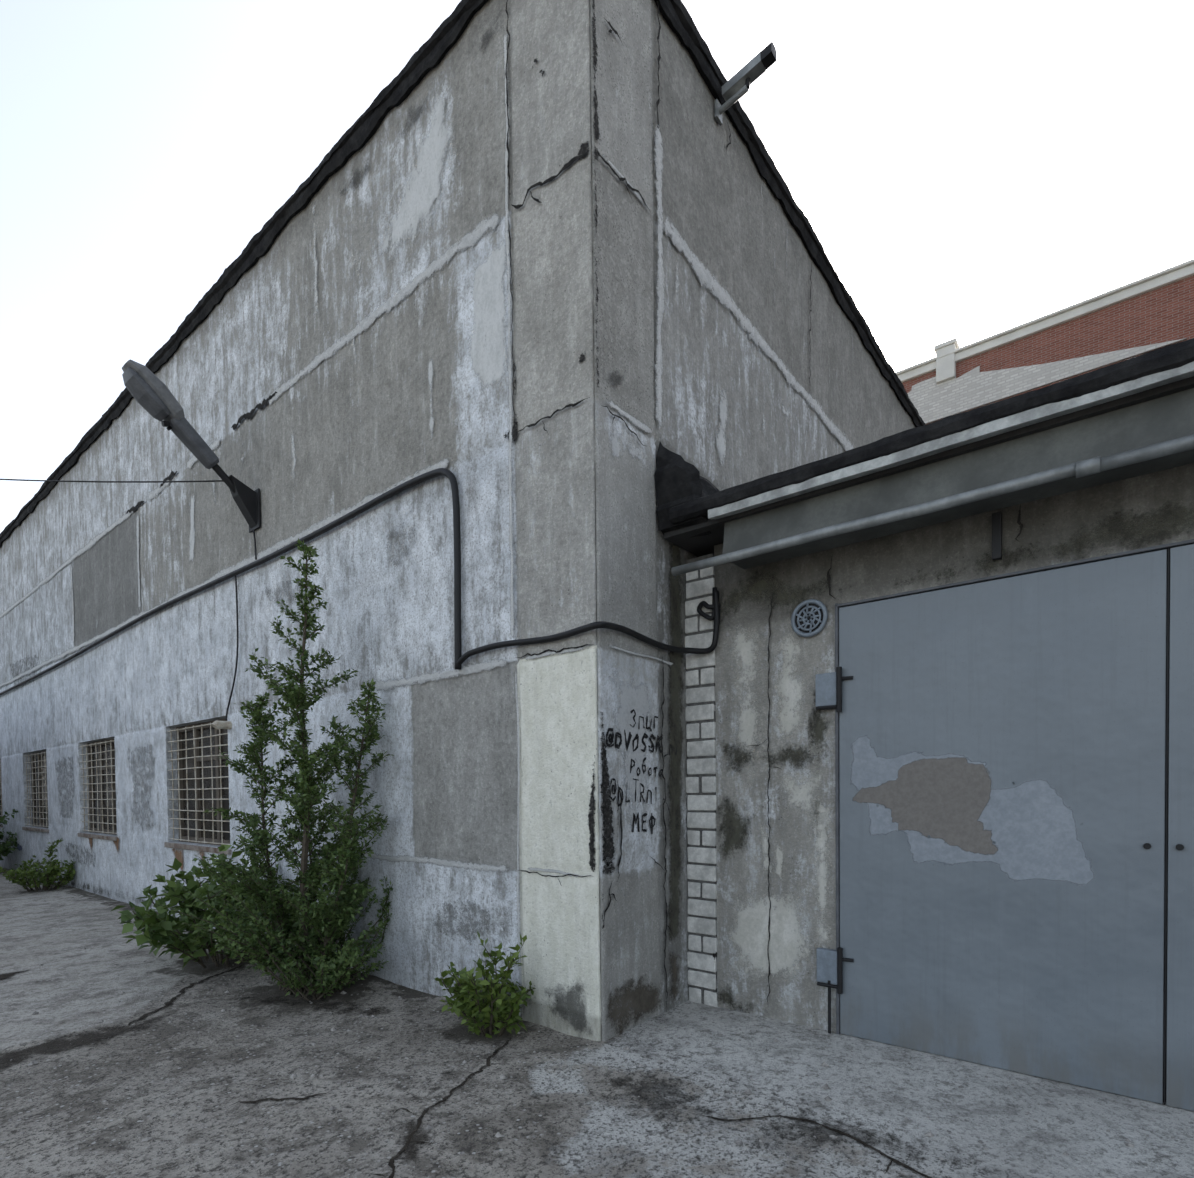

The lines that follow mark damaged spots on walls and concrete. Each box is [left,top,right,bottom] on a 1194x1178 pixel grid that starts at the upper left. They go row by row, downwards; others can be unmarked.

crack [505,0,659,446]
crack [806,262,814,383]
leakage [1056,504,1194,558]
leakage [720,571,841,622]
leakage [667,544,684,940]
crack [750,586,782,1002]
leakage [718,625,833,979]
peeling [851,736,1094,885]
leakage [552,984,587,1031]
leakage [608,954,680,1035]
leakage [714,989,752,1013]